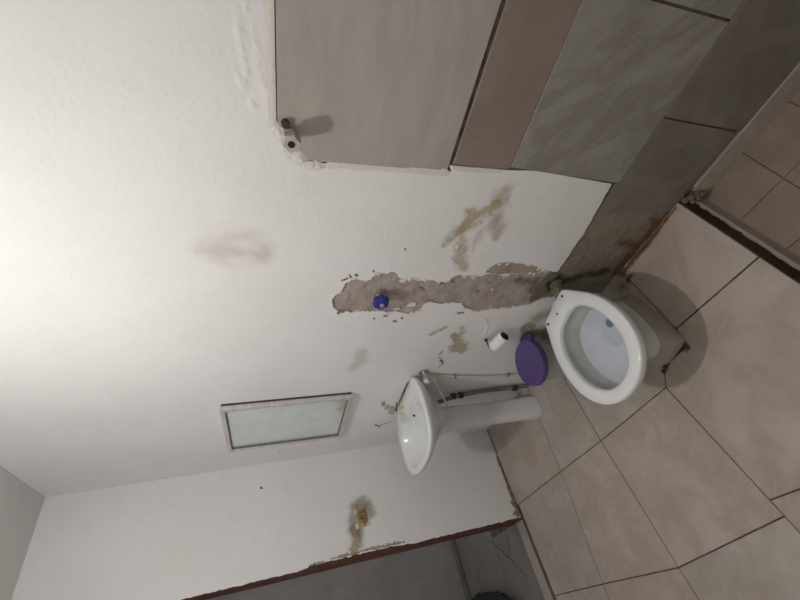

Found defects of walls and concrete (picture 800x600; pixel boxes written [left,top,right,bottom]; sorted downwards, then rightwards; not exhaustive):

water stain [447,201,497,262]
spalling [332,209,669,323]